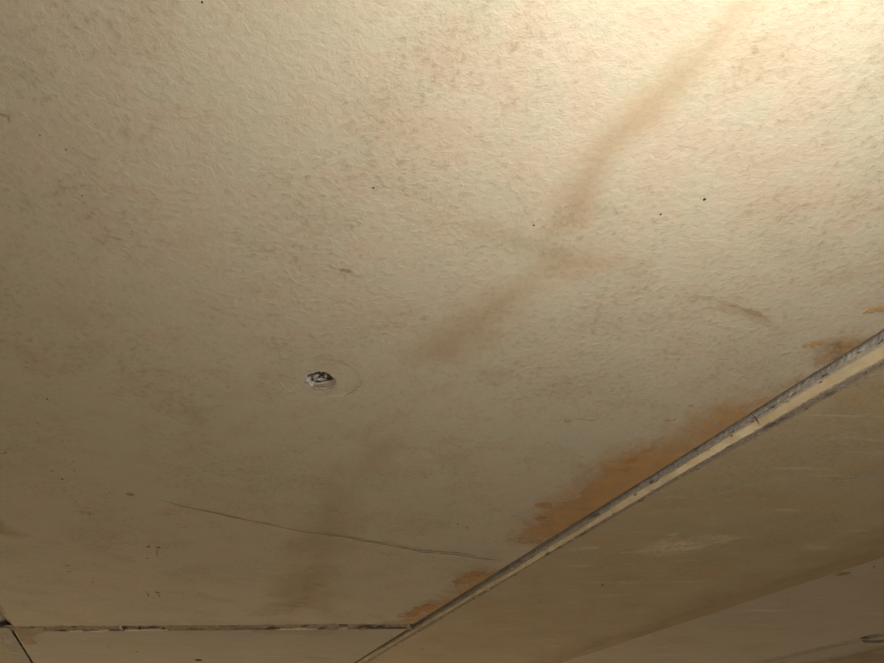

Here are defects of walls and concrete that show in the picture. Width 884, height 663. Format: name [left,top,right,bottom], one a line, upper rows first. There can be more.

crack [166,501,493,560]
corrosion [522,401,769,543]